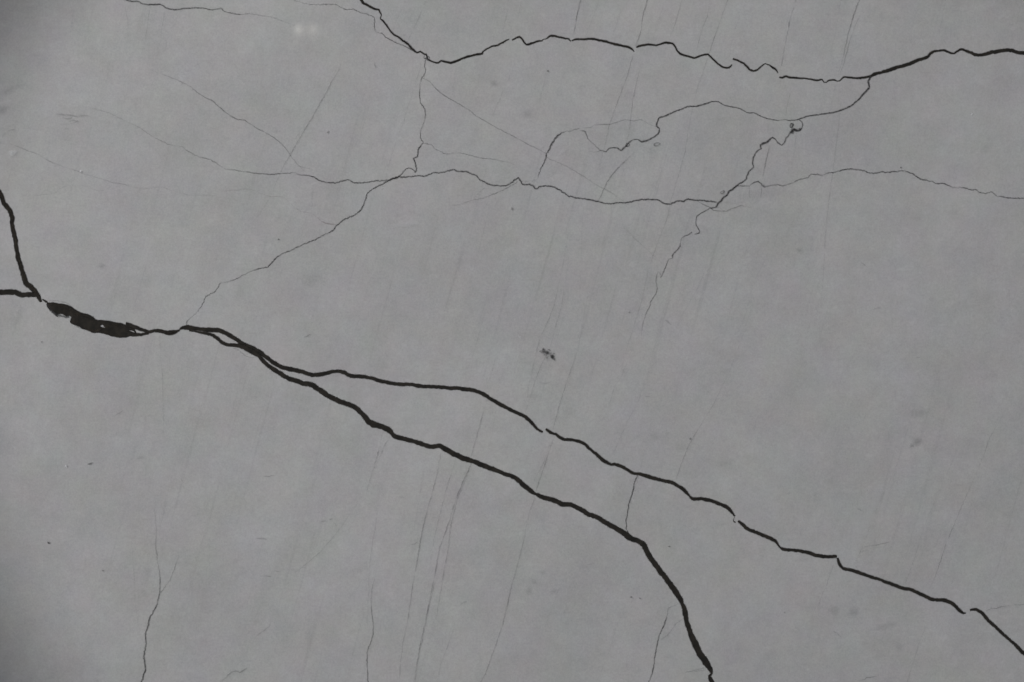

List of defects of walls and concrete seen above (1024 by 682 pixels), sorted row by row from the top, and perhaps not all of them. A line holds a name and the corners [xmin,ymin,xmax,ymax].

crack [258,0,1024,269]
crack [0,190,1024,682]